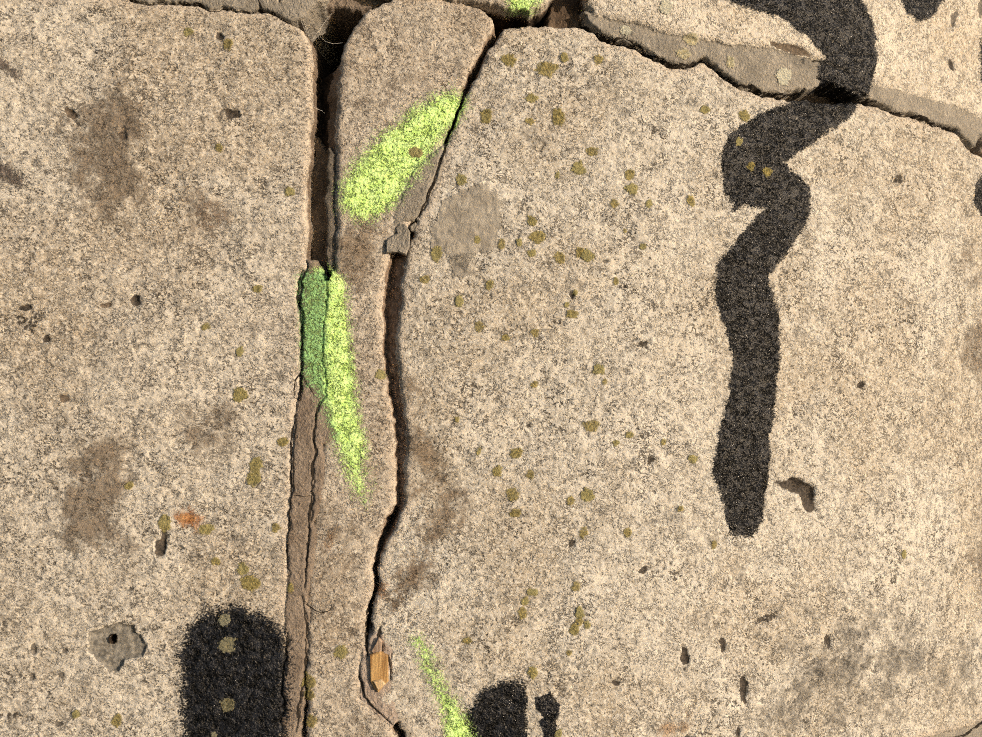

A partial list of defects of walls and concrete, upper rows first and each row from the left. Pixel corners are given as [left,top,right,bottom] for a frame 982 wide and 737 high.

crack [580,26,966,148]
crack [359,28,499,737]
corrosion [176,513,202,526]
crack [280,271,332,728]
spalling [775,477,815,512]
crack [956,721,982,737]